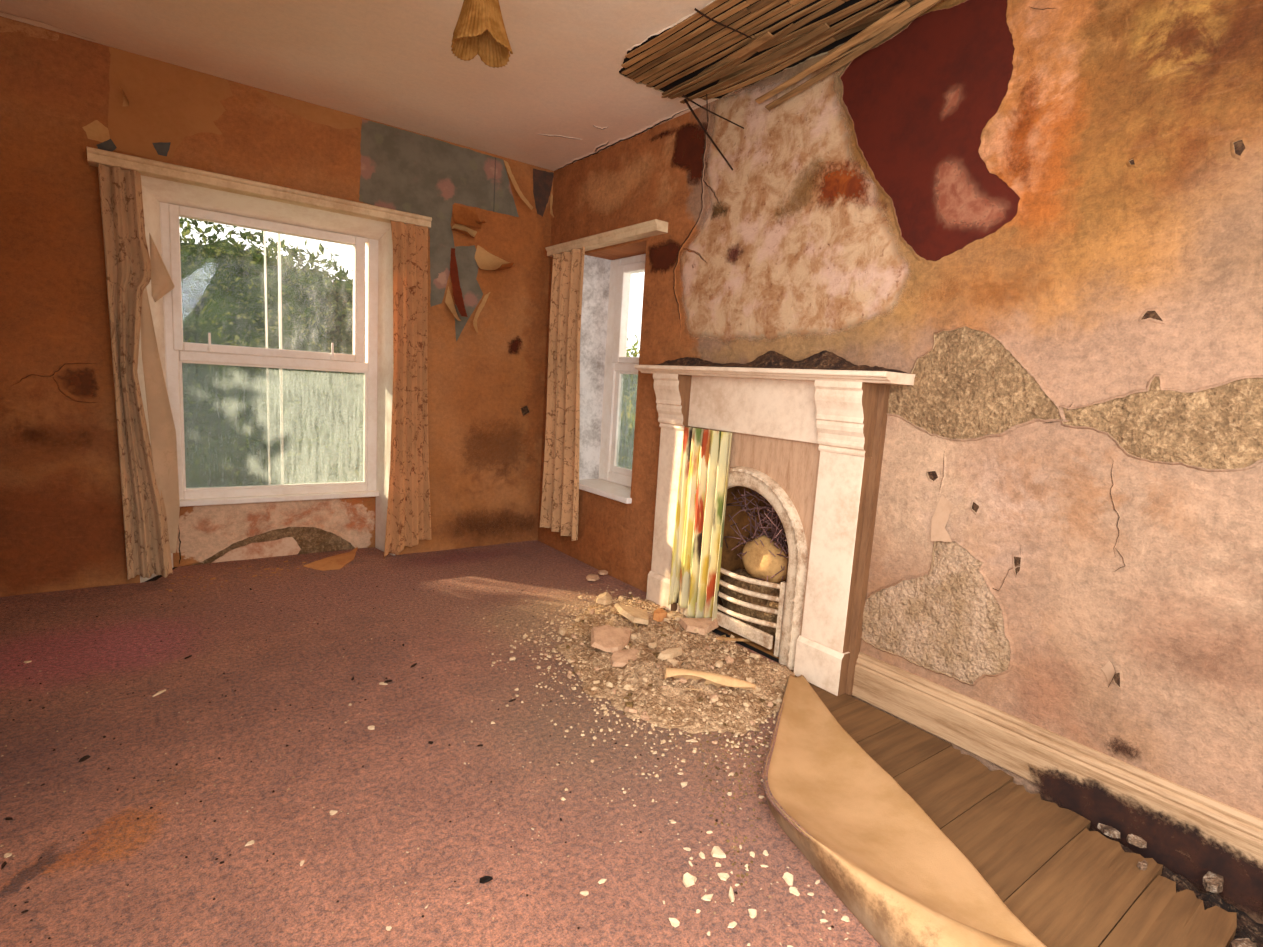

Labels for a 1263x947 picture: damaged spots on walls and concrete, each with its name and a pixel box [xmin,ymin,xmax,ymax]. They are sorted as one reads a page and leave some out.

peeling [681,0,1024,342]
damp [59,368,97,396]
spalling [887,324,1263,472]
spalling [1138,308,1166,324]
spalling [175,522,358,567]
spalling [861,469,1015,686]
damp [1030,768,1263,920]